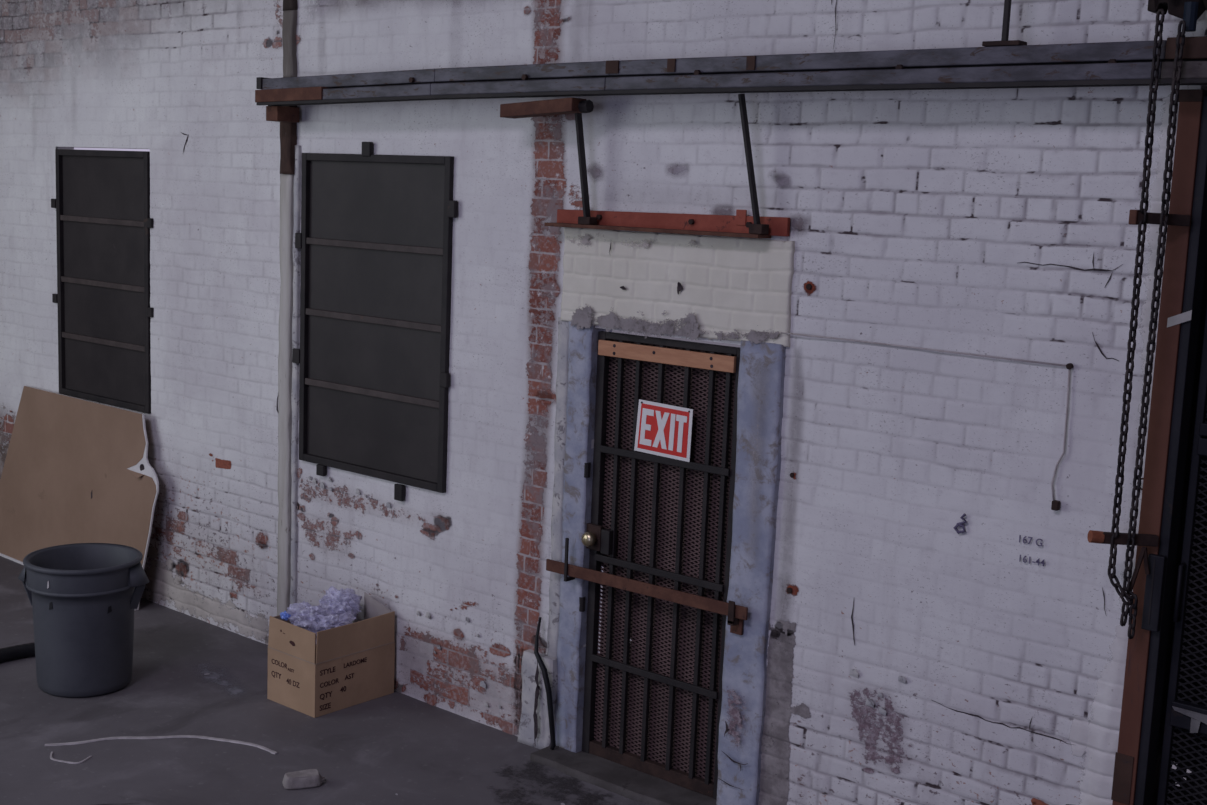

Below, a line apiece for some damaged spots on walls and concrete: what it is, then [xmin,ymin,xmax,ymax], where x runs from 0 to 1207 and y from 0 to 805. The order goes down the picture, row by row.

spalling [571,304,779,344]
flaking render [394,114,583,735]
peeling [297,468,449,560]
peeling [849,669,911,774]